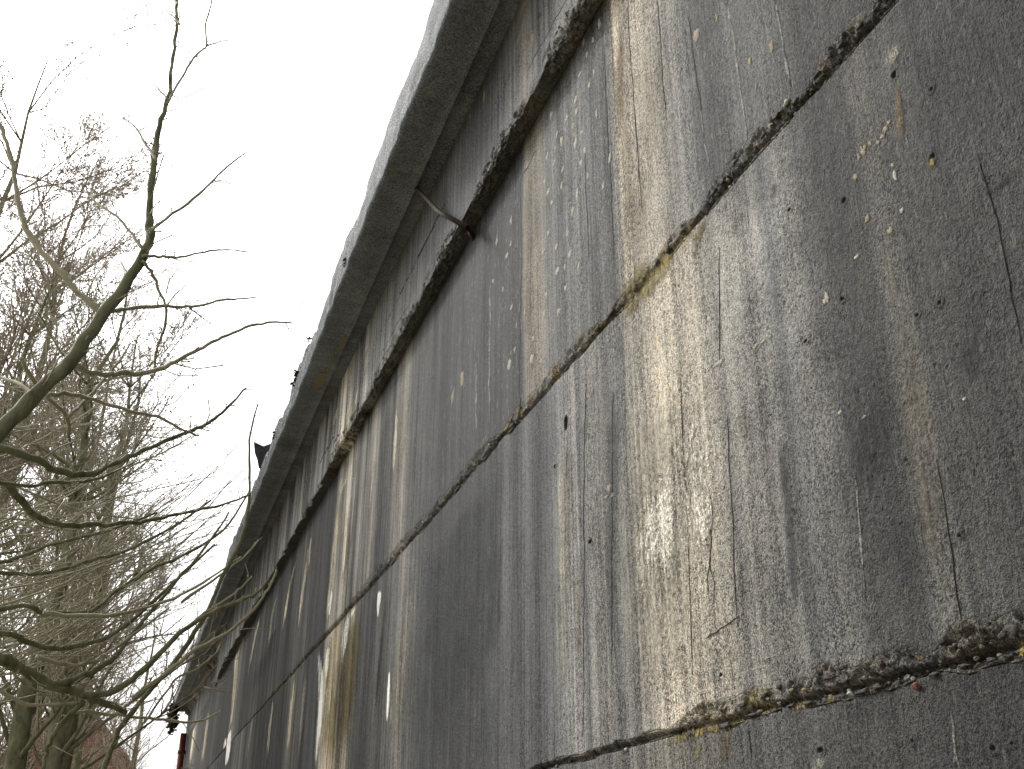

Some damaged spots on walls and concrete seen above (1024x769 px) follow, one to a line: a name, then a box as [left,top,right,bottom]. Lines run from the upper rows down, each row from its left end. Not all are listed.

crack [977,154,1021,342]
leakage [393,403,408,473]
leakage [327,509,354,619]
crack [680,377,738,675]
crack [936,458,963,630]
leakage [190,713,209,760]
leakage [224,540,311,764]
leakage [287,607,359,759]
leakage [386,588,415,732]